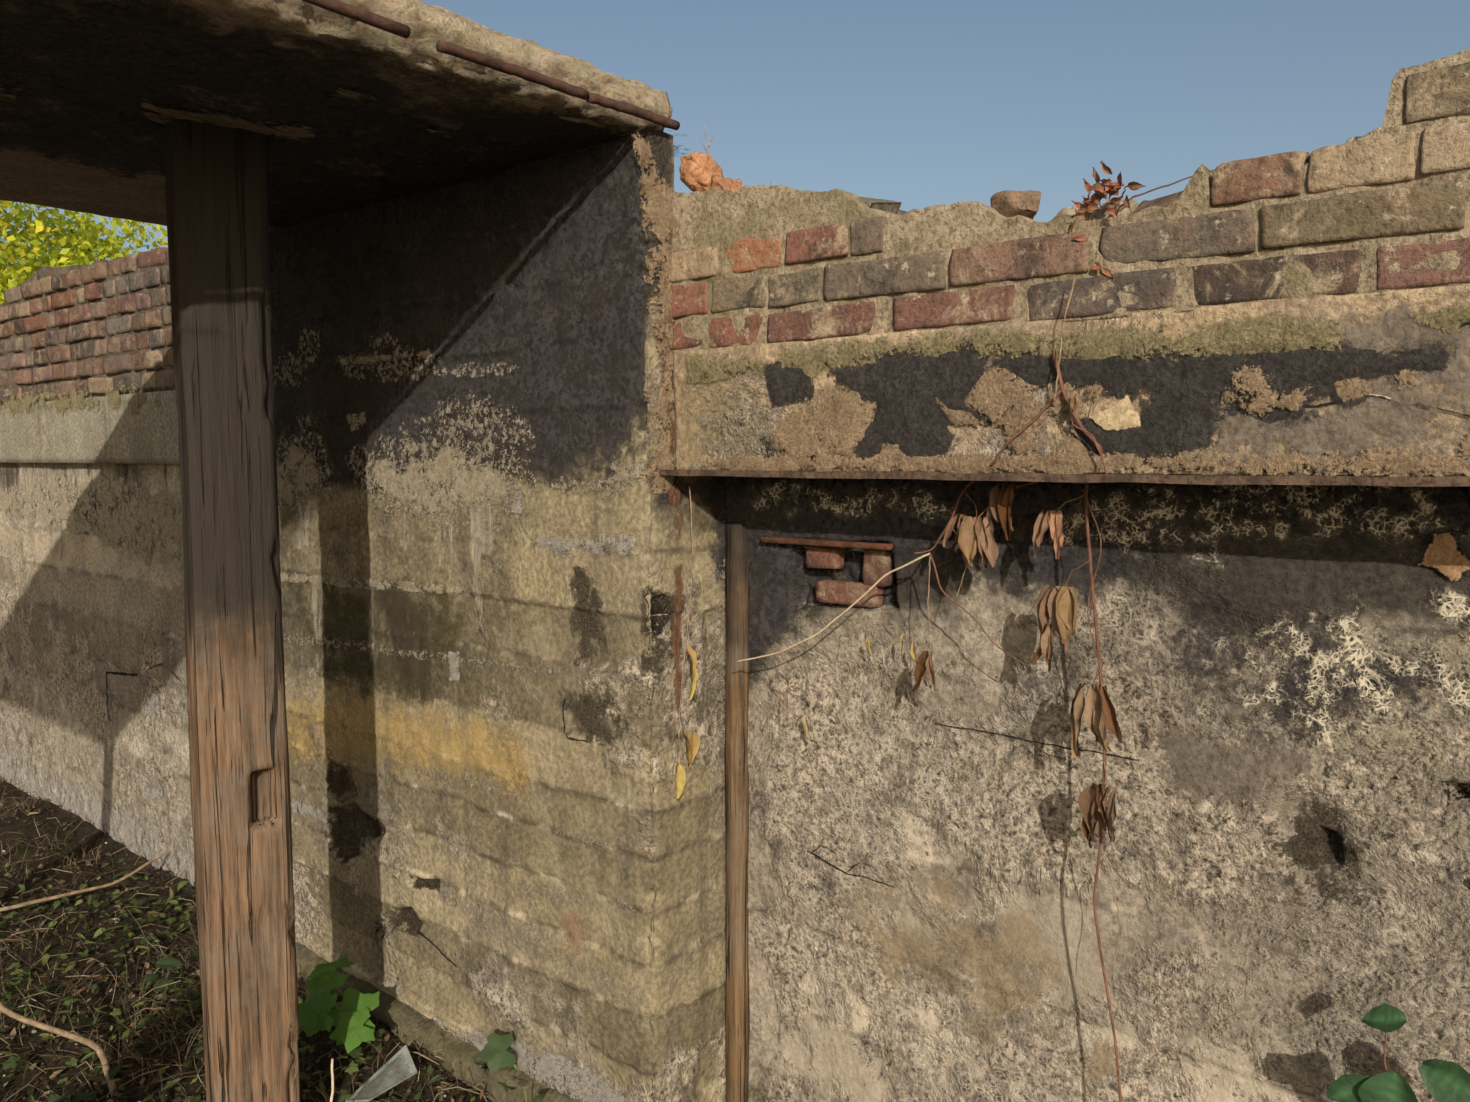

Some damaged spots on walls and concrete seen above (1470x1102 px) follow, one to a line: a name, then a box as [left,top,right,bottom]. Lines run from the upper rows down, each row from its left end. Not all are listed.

peeling [633,133,676,494]
peeling [701,305,1470,477]
water stain [273,325,645,797]
water stain [1171,624,1257,693]
water stain [1419,630,1470,681]